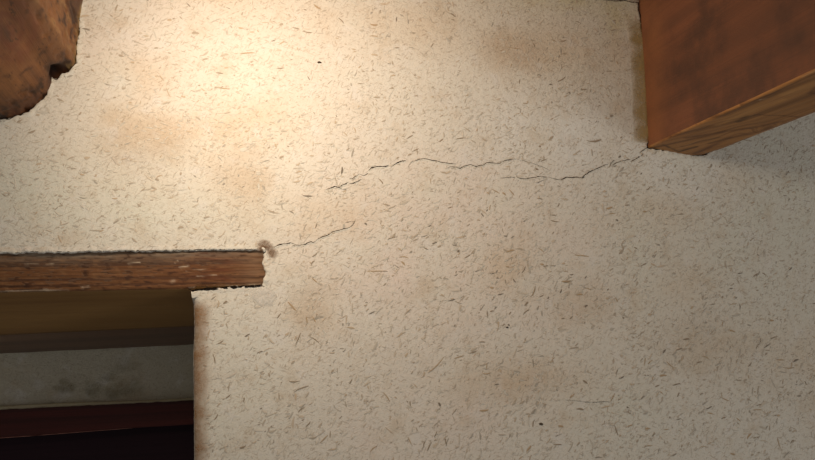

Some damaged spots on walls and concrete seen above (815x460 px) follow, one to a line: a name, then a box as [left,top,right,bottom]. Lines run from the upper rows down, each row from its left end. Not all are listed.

crack [326,148,648,191]
crack [274,221,355,249]